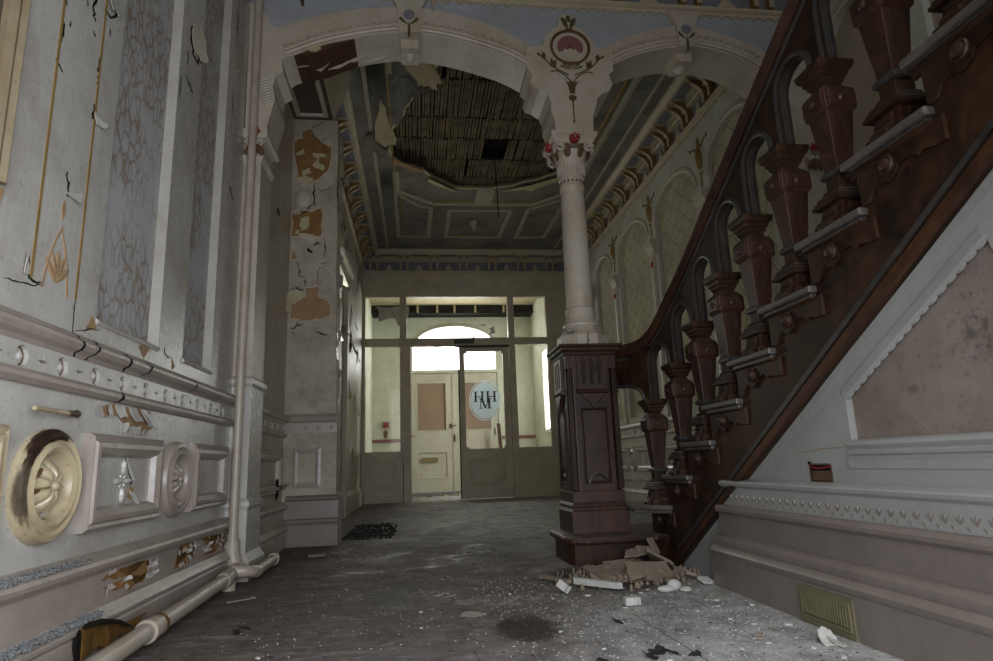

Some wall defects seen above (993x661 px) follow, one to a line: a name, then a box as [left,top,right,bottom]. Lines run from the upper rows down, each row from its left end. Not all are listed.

flaking render [293,39,389,83]
peeling [405,63,442,90]
spalling [375,97,558,192]
flaking render [277,122,364,415]
flaking render [371,305,533,335]
peeling [174,532,225,569]
peeling [101,557,159,595]